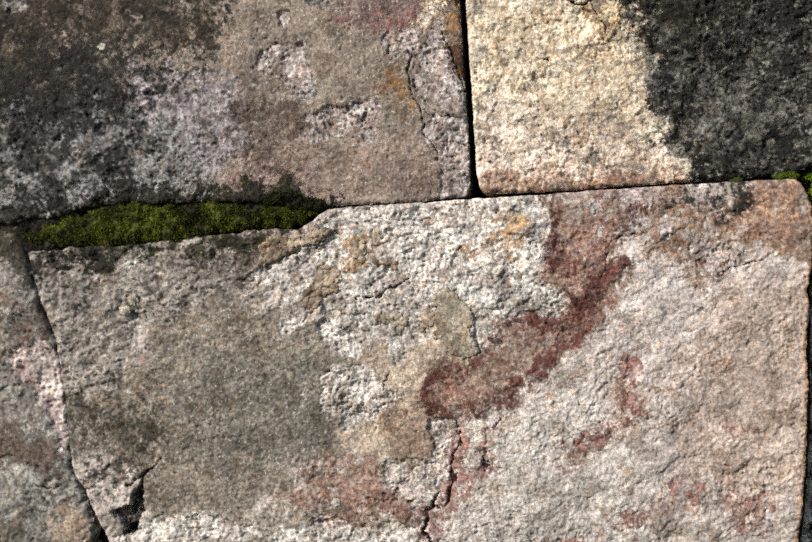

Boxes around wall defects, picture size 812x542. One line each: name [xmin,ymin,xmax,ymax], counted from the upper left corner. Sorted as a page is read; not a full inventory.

crack [567,0,607,30]
water stain [0,0,237,138]
crack [406,62,439,153]
water stain [614,0,812,182]
crack [126,458,162,487]
crack [422,422,463,542]
crack [482,416,504,472]